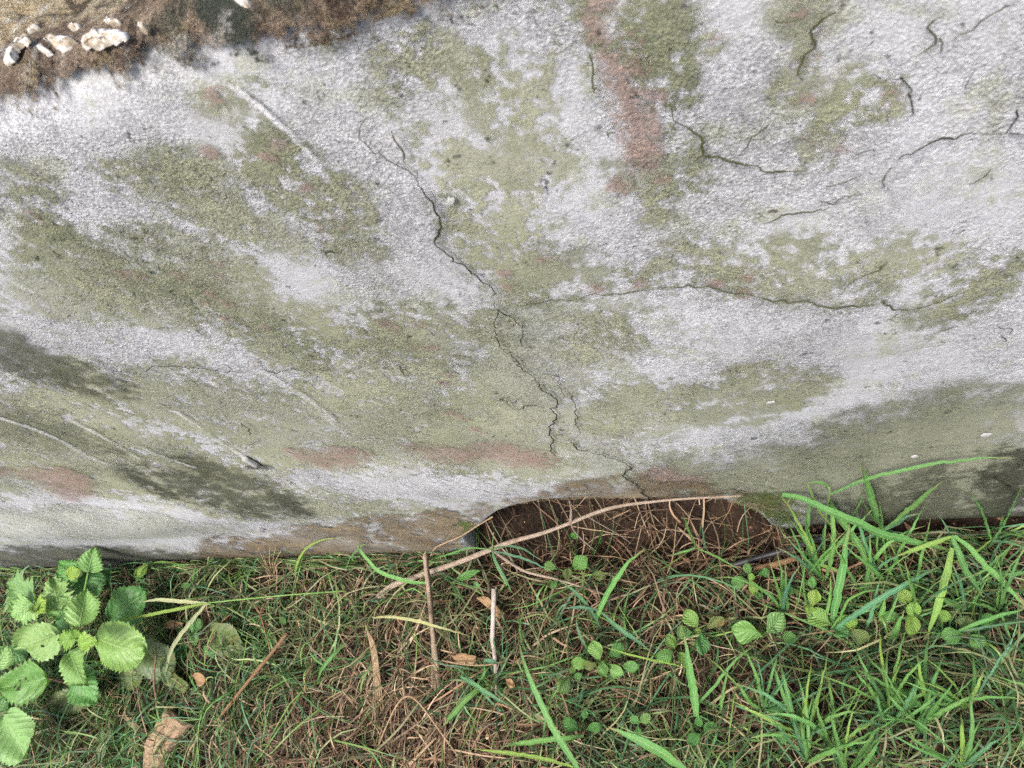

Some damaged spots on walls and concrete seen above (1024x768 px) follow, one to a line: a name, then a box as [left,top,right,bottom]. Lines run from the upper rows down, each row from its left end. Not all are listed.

crack [587,50,601,95]
crack [775,12,836,82]
crack [867,75,914,121]
crack [918,5,1014,56]
crack [765,109,1024,223]
crack [357,104,968,501]
water stain [0,331,136,399]
water stain [0,407,123,455]
water stain [123,456,312,519]
water stain [648,384,1024,526]